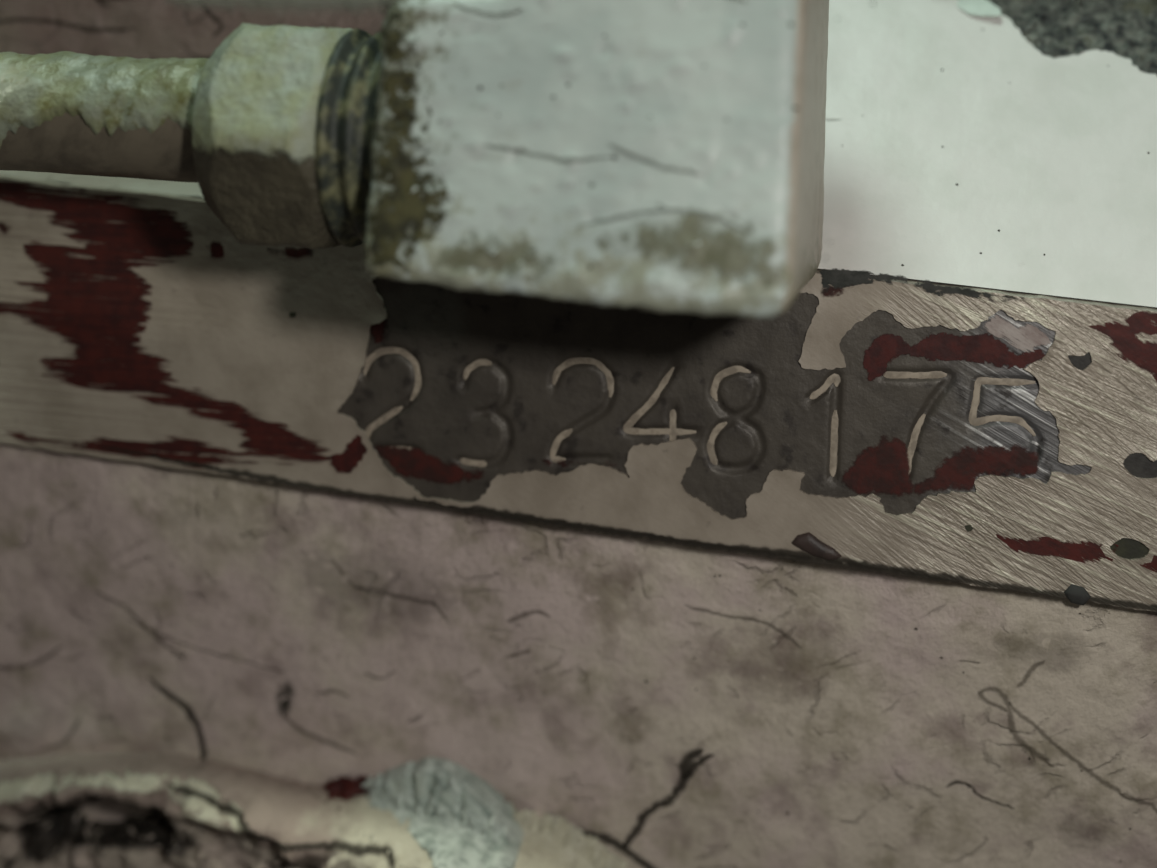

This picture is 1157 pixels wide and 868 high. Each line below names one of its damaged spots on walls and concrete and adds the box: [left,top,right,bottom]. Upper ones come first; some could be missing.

crack [0,0,136,32]
peeling [338,268,1092,519]
peeling [1123,453,1157,478]
spalling [17,795,194,864]
peeling [362,757,524,868]
crack [581,749,714,868]
crack [947,781,1015,809]